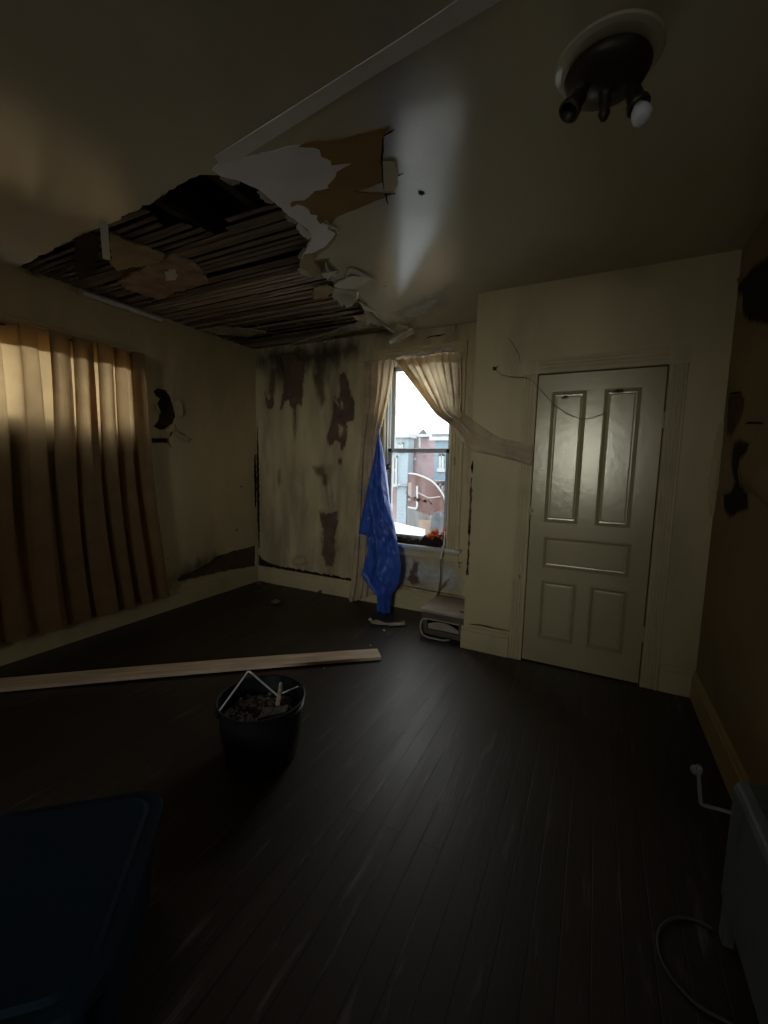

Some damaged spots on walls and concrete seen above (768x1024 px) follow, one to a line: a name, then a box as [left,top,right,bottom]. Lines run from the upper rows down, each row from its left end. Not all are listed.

peeling [212,125,399,334]
peeling [265,353,305,409]
water stain [259,344,356,403]
hole [151,389,192,448]
peeling [327,372,355,464]
spalling [707,393,750,516]
peeling [318,508,339,566]